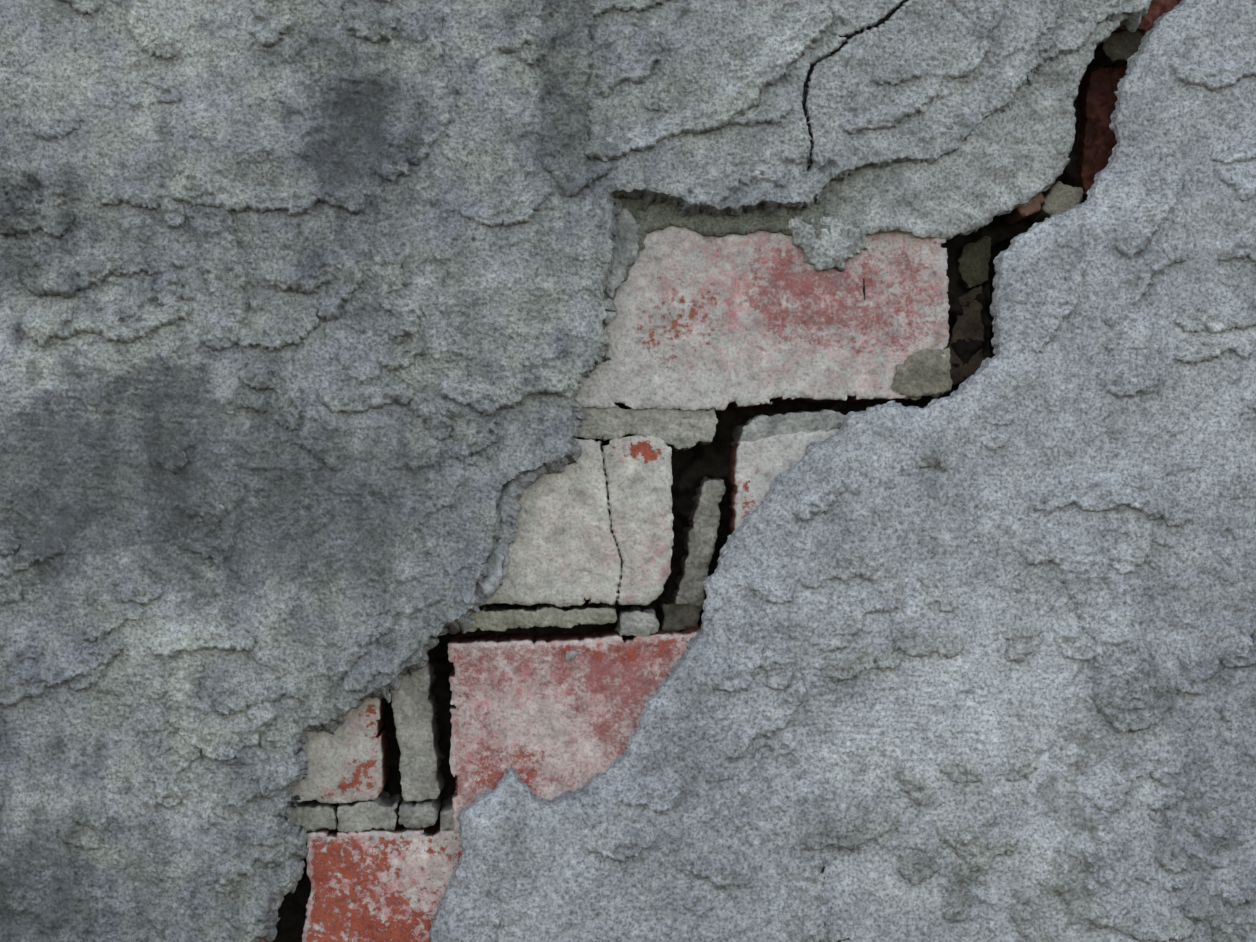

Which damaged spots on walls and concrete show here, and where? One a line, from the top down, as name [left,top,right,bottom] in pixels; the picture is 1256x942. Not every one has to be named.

crack [803,0,908,170]
flaking render [603,14,1130,353]
crack [1049,62,1099,204]
peeling [637,277,724,368]
flaking render [466,465,548,617]
peeling [611,440,664,464]
crack [428,215,1042,820]
peeling [321,704,377,799]
crack [383,689,403,799]
peeling [456,637,693,801]
crack [276,831,311,942]
peeling [268,835,462,942]